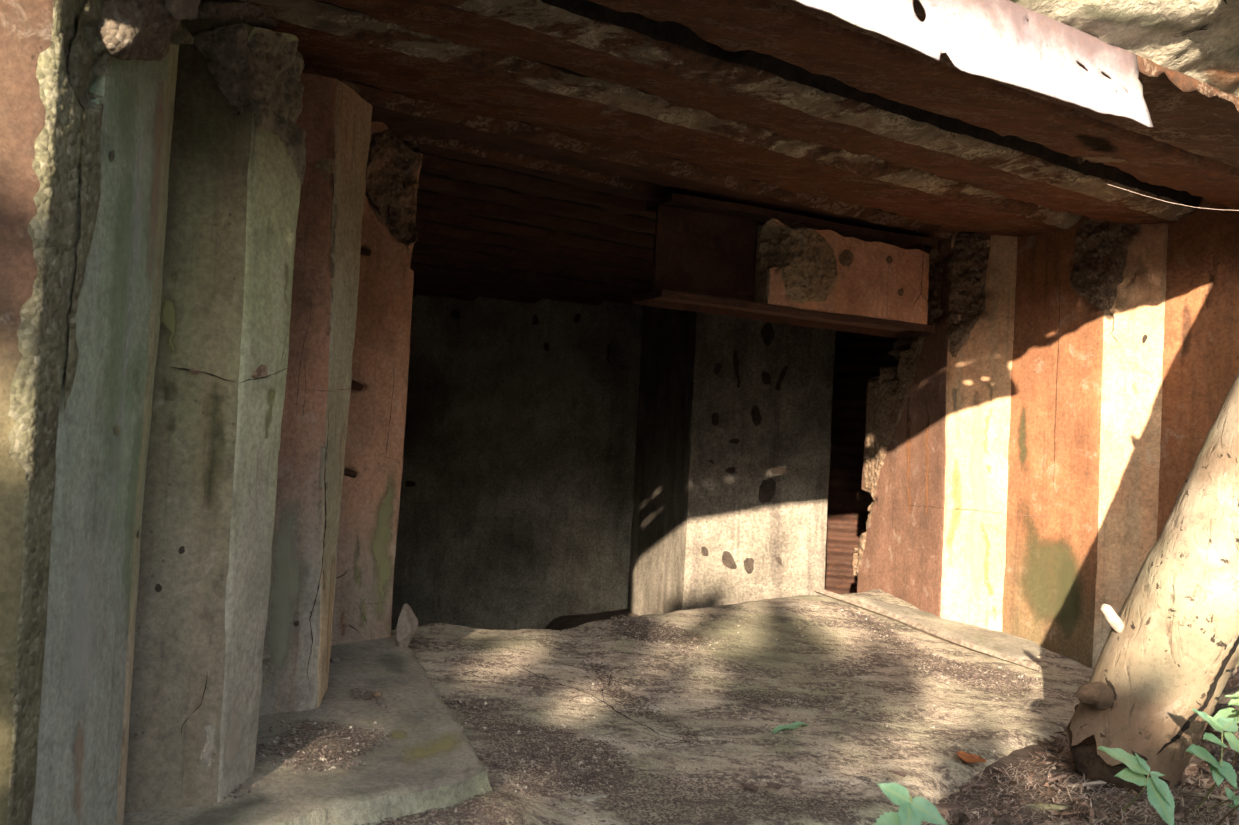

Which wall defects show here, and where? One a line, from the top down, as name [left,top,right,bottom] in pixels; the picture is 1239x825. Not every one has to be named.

spalling [8,0,306,478]
spalling [366,129,422,253]
spalling [761,222,854,303]
spalling [924,231,991,357]
spalling [1070,217,1141,312]
corrosion [351,380,368,391]
crack [172,288,384,690]
corrosion [344,468,358,478]
spalling [852,335,924,577]